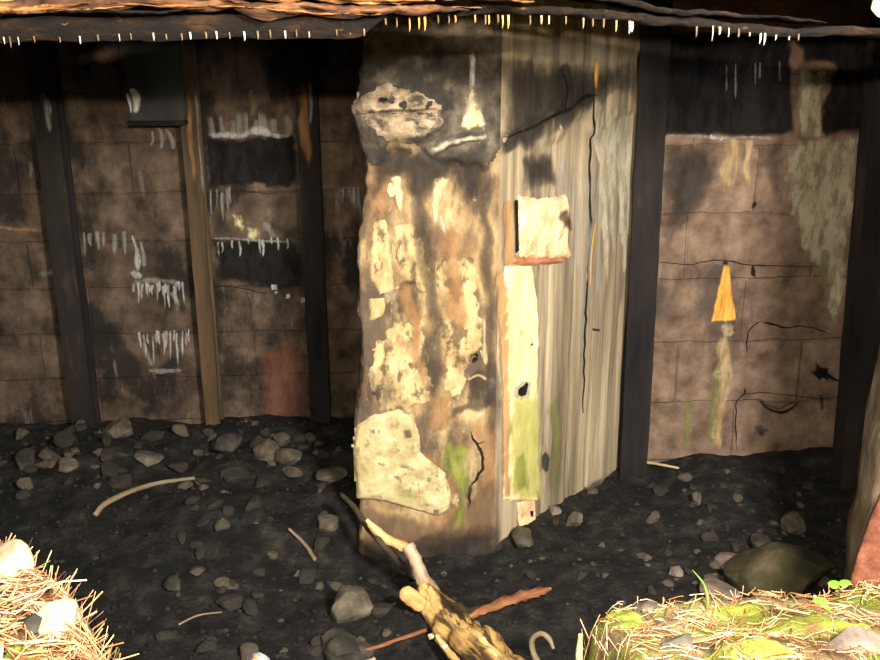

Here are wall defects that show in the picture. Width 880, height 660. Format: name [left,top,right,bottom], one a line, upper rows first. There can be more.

flaking render [352,219,491,515]
crack [468,431,485,515]
flaking render [497,194,572,526]
crack [502,66,596,413]
crack [734,388,830,447]
crack [746,321,831,353]
leakage [789,70,857,316]